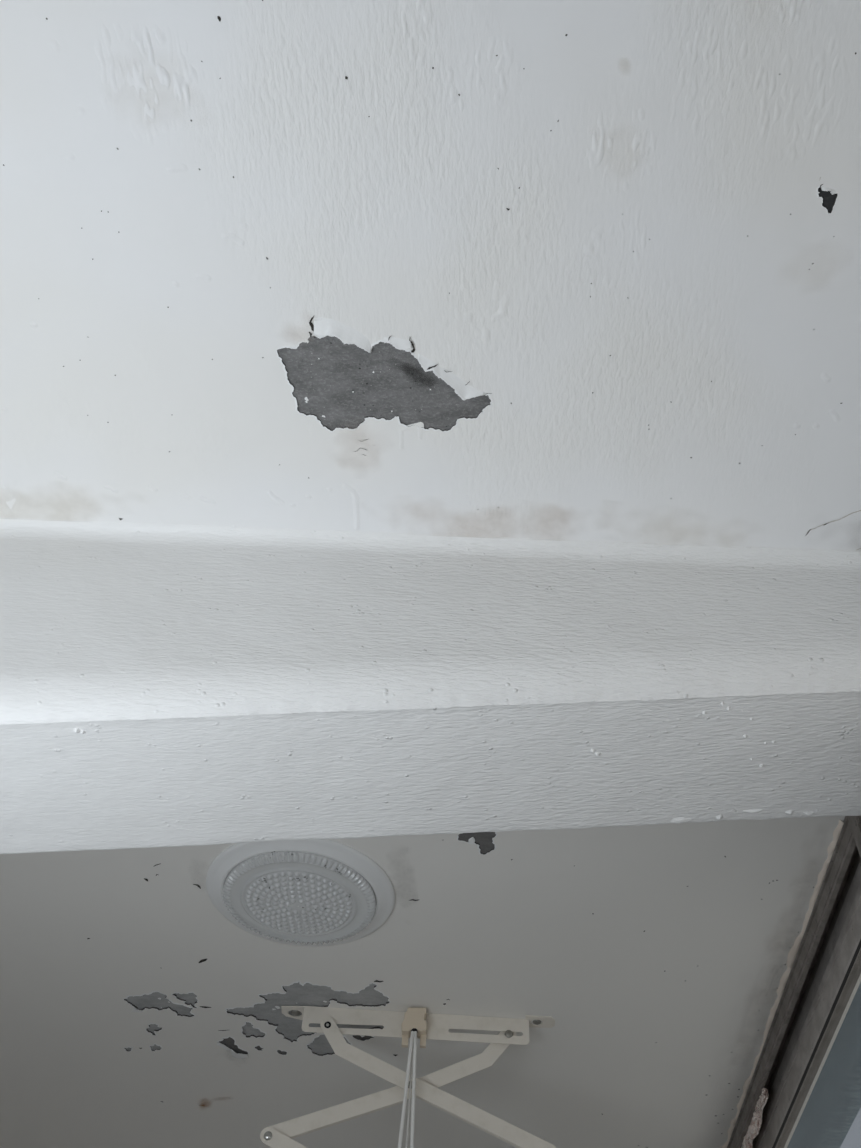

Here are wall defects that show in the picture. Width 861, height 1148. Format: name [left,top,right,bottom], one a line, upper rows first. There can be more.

peeling [816,177,839,214]
peeling [276,316,493,433]
peeling [457,832,497,855]
peeling [123,991,211,1052]
peeling [217,980,391,1059]